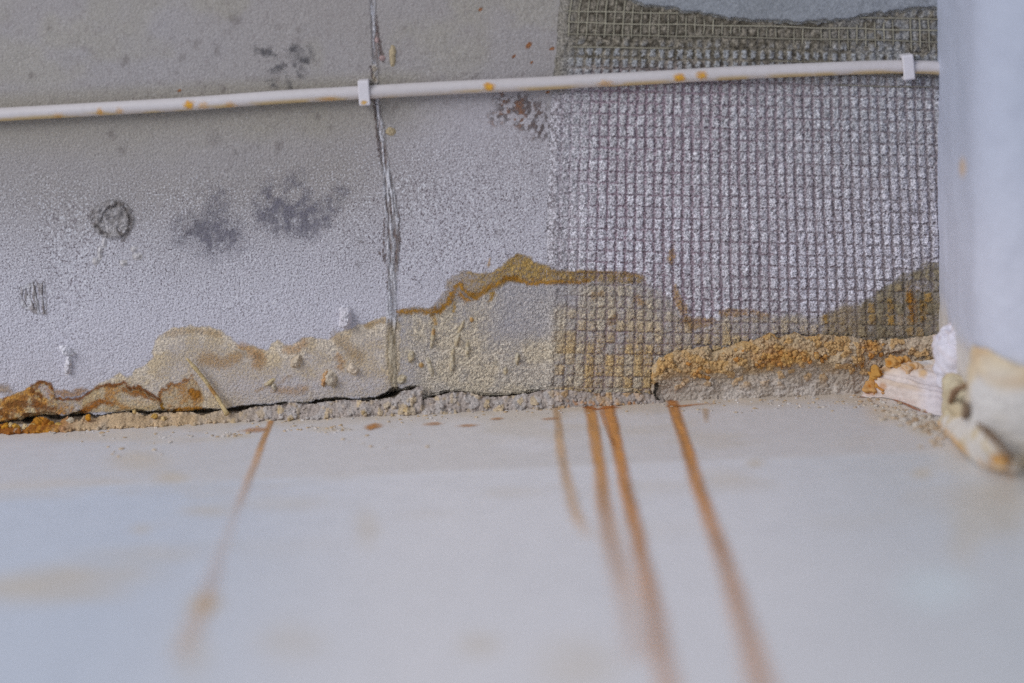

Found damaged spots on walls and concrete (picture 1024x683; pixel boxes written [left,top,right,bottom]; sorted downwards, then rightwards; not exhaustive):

damp [191,198,239,248]
crack [0,0,535,424]
damp [259,189,331,236]
spalling [19,282,47,315]
corrosion [0,379,204,422]
flaking render [0,322,1024,468]
corrosion [247,421,273,457]
corrosion [668,400,728,557]
corrosion [585,405,656,605]